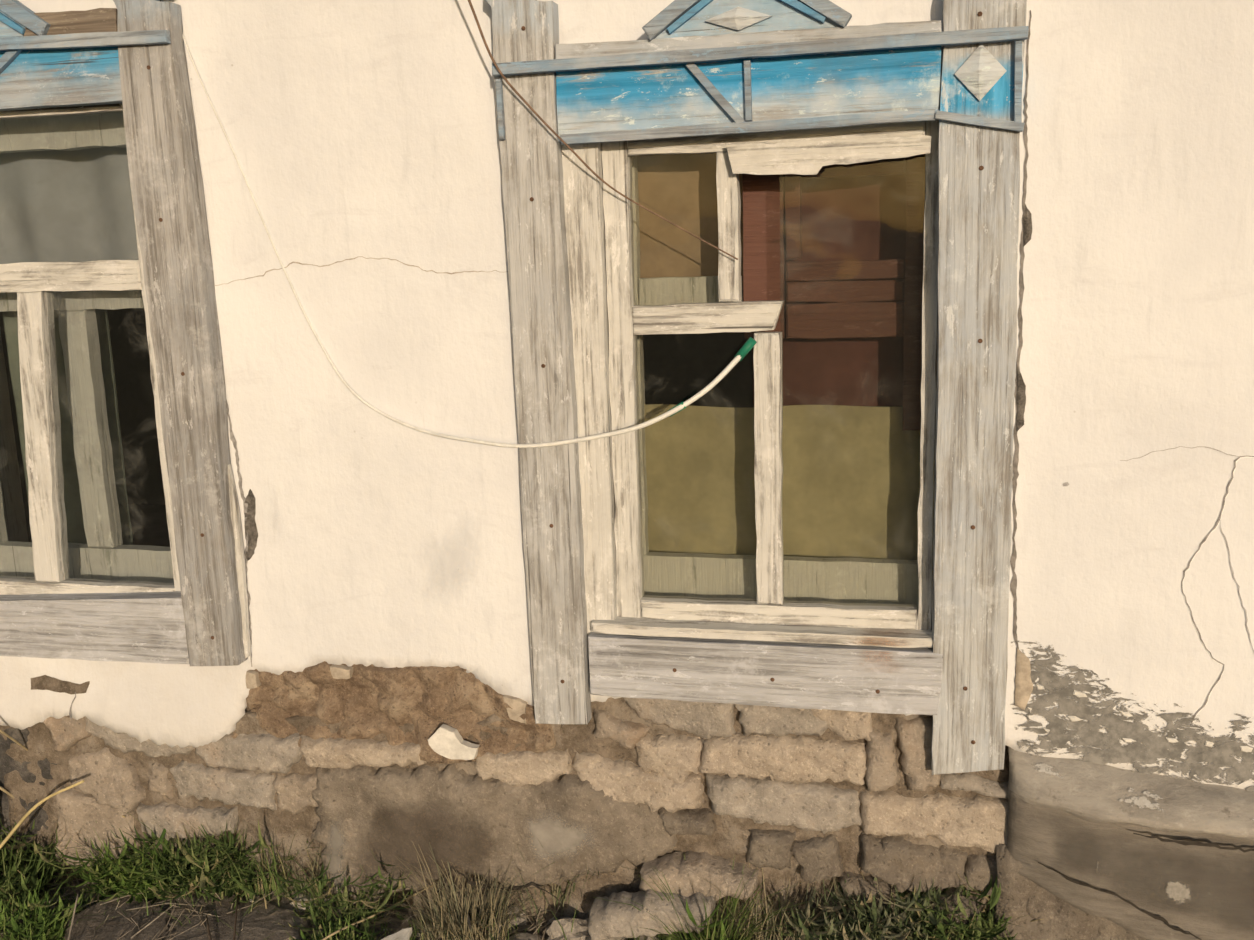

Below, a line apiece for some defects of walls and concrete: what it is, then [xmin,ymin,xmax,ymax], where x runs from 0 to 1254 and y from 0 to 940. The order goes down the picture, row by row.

crack [214,256,508,286]
spalling [226,400,557,764]
peeling [1010,10,1254,792]
crack [1120,446,1254,728]